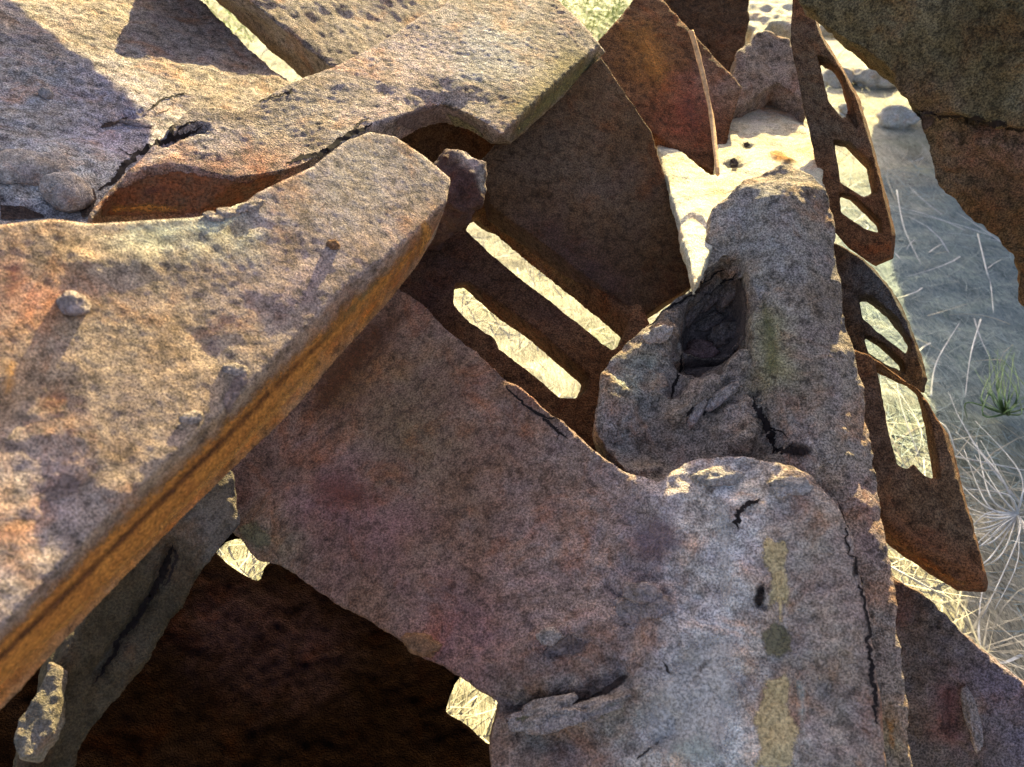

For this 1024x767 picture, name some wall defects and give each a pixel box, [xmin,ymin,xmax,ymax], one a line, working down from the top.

crack [258,87,293,103]
crack [98,92,202,191]
crack [286,118,372,164]
crack [502,381,568,440]
crack [752,396,795,454]
crack [732,498,762,530]
crack [837,499,879,725]